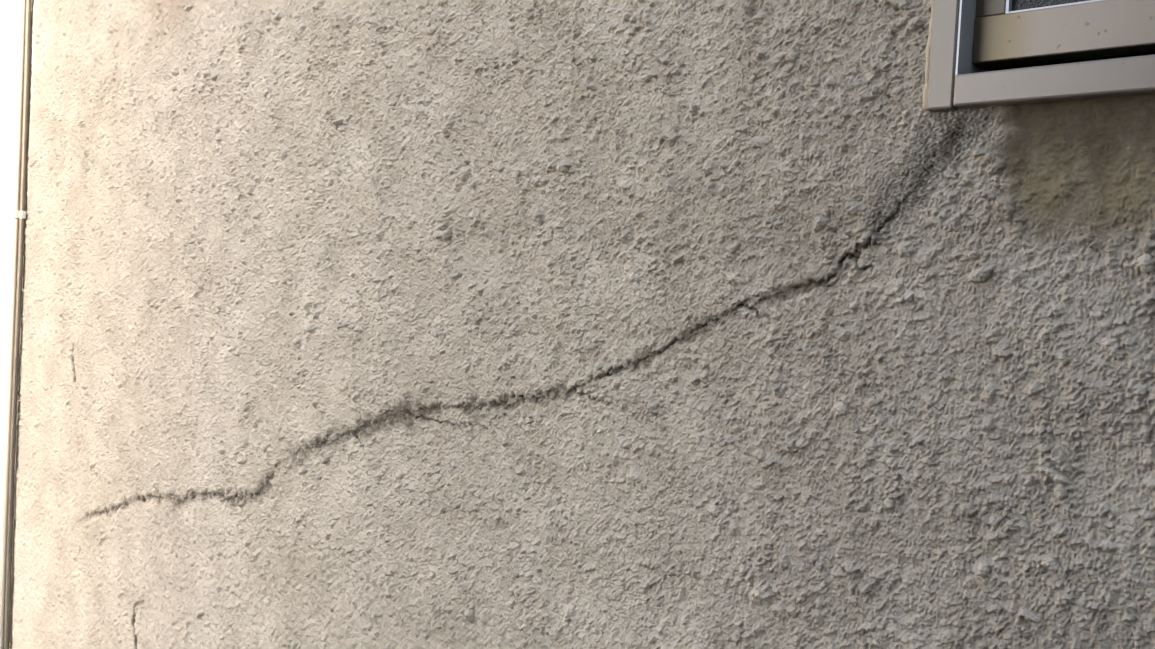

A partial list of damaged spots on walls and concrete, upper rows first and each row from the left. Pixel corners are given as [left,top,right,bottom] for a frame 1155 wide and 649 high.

crack [93,203,902,516]